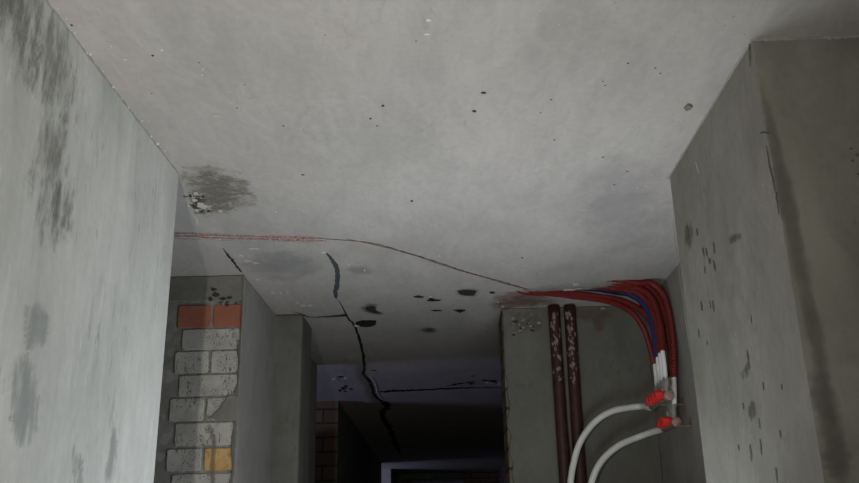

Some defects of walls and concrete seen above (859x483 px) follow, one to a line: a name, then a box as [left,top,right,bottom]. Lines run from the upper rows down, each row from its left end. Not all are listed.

damp [190,171,250,212]
crack [223,249,242,273]
crack [292,238,541,454]